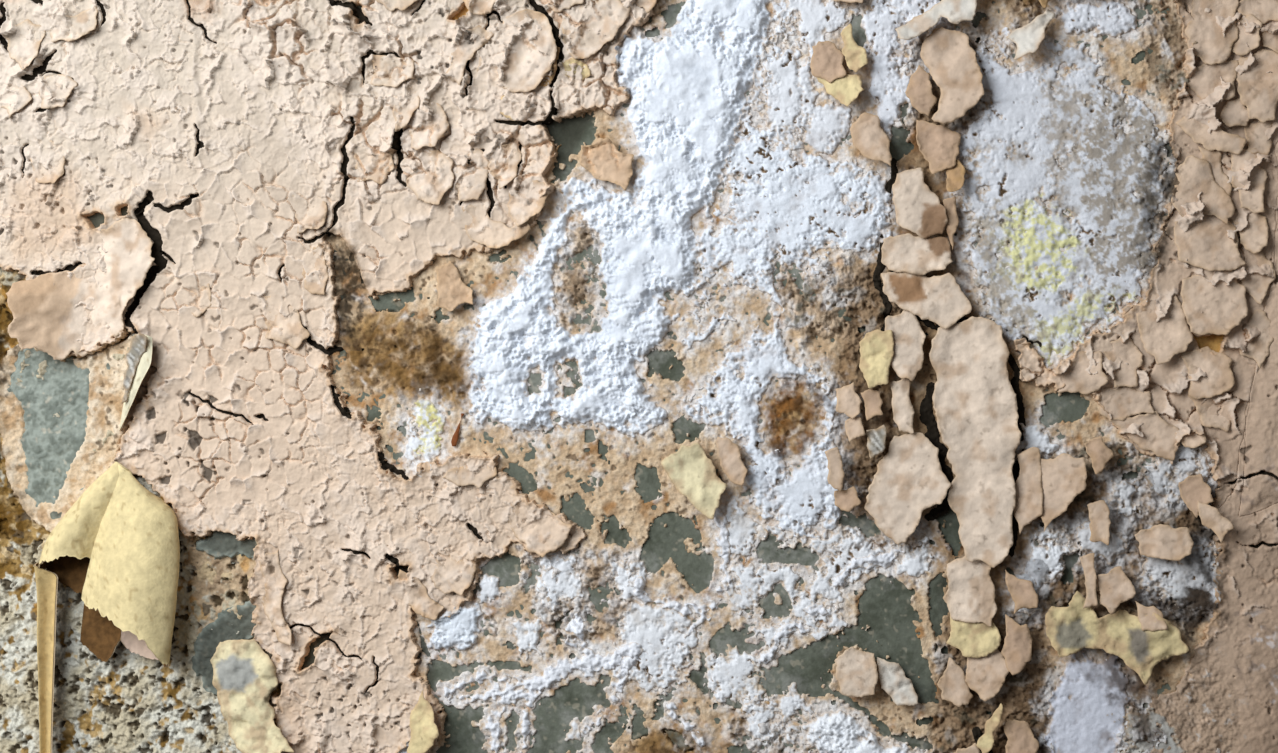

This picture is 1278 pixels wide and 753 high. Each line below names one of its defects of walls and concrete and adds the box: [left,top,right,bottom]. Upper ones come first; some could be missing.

damp [0,298,17,385]
crack [0,0,74,112]
crack [124,191,199,334]
crack [278,117,356,283]
crack [329,0,402,85]
crack [391,128,407,187]
peeling [0,0,972,753]
crack [460,0,564,217]
damp [329,0,962,753]
peeling [748,0,1278,753]
damp [953,0,1179,367]
damp [0,495,21,535]